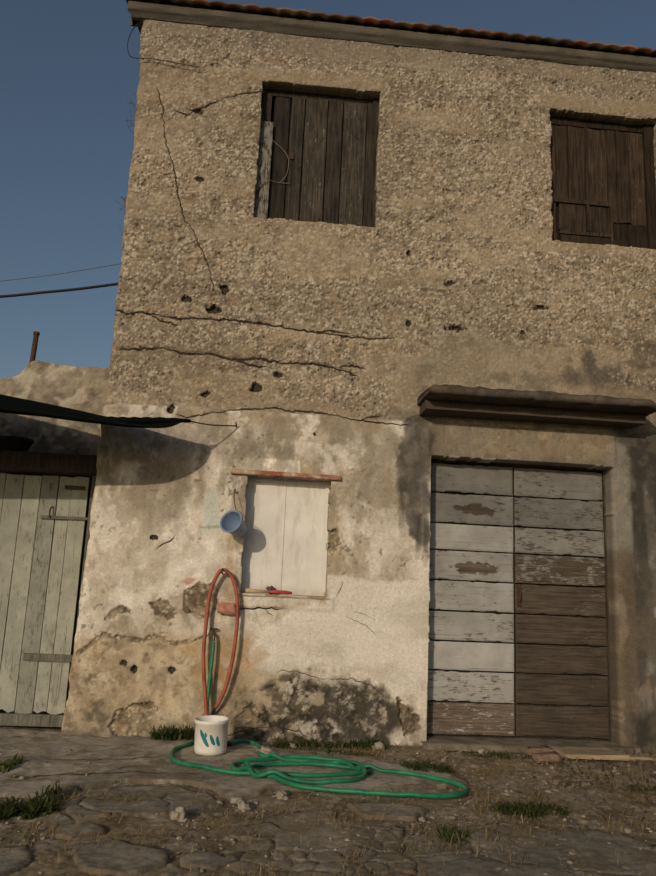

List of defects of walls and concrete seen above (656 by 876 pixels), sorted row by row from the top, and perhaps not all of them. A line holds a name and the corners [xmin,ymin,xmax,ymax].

crack [116,310,394,340]
crack [118,347,365,376]
spalling [327,527,341,556]
peeling [101,501,222,621]
flaking render [76,631,210,656]
damp [61,698,116,737]
spalling [108,699,157,736]
damp [144,667,423,745]
spalling [396,696,421,737]